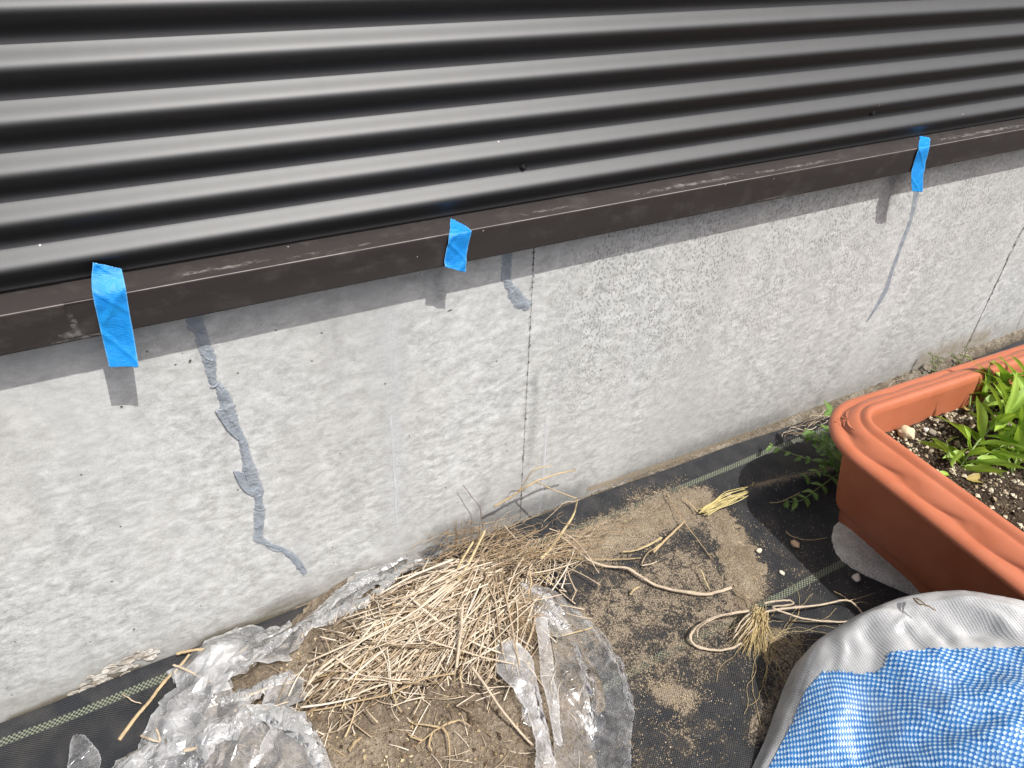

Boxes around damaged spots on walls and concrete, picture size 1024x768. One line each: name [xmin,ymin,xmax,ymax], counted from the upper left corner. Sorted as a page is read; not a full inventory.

crack [186,315,308,576]
crack [501,248,535,514]
crack [866,191,919,322]